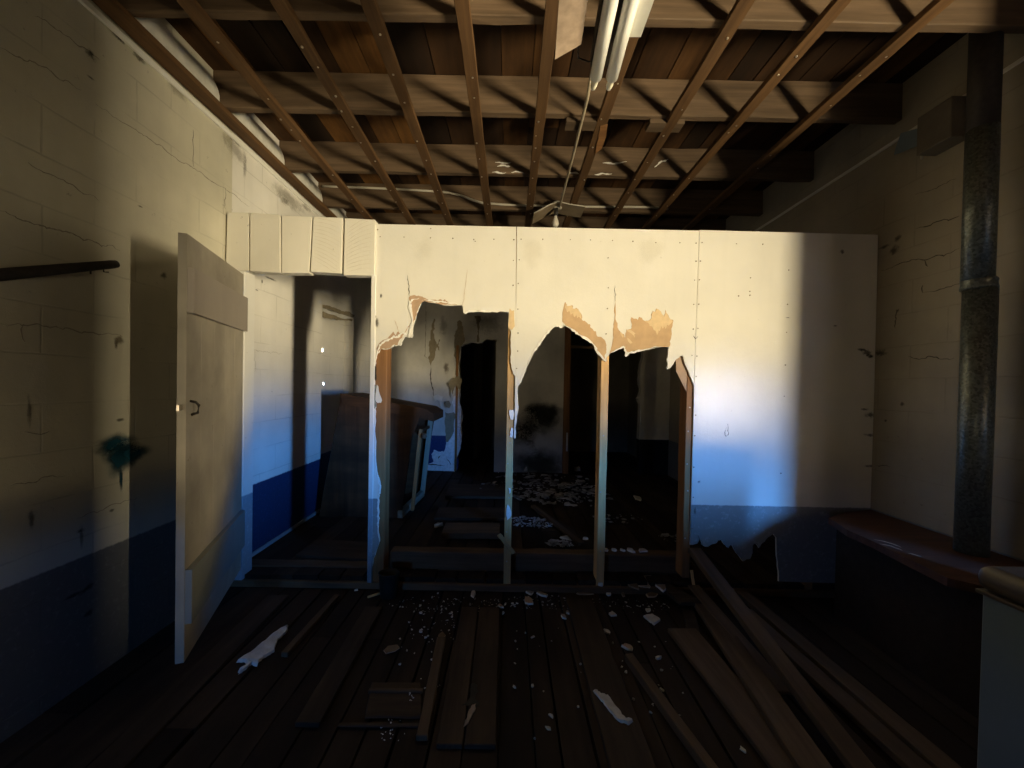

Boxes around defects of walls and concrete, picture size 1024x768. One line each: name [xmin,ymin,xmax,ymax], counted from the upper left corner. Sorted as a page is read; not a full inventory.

crack [2,48,241,207]
flaking render [428,310,498,471]
water stain [513,404,560,473]
spalling [527,325,669,368]